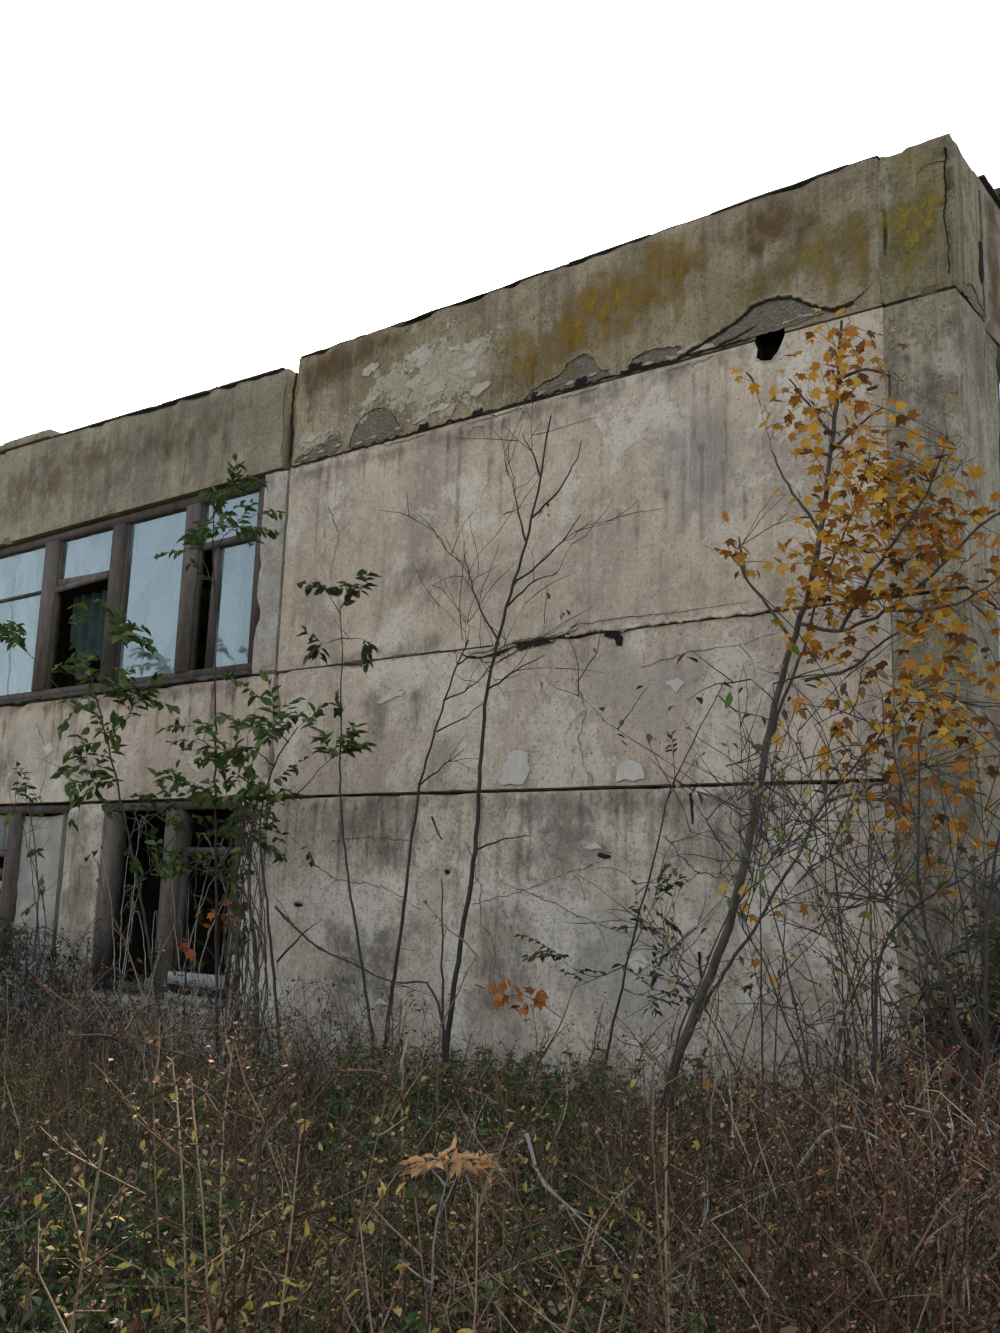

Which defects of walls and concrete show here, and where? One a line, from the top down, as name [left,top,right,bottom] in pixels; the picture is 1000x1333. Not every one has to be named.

crack [918,147,986,319]
peeling [292,316,516,463]
spalling [523,350,610,401]
crack [642,633,777,673]
peeling [501,749,530,785]
peeling [615,759,645,782]